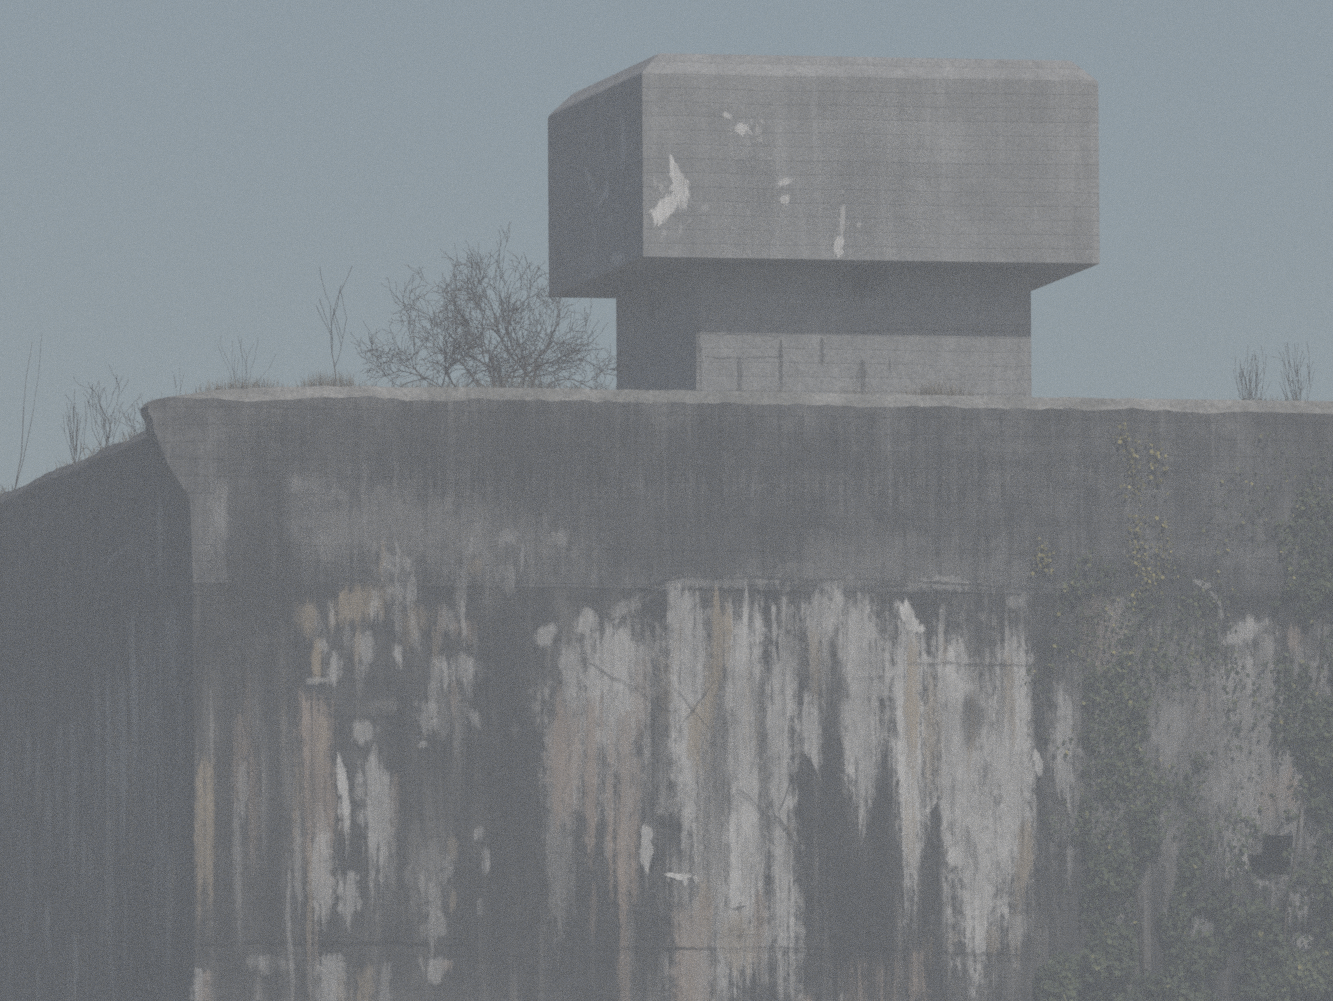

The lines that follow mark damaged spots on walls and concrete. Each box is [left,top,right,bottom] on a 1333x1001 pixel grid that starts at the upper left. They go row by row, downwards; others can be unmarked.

water stain [336,754,350,829]
water stain [532,587,1077,1001]